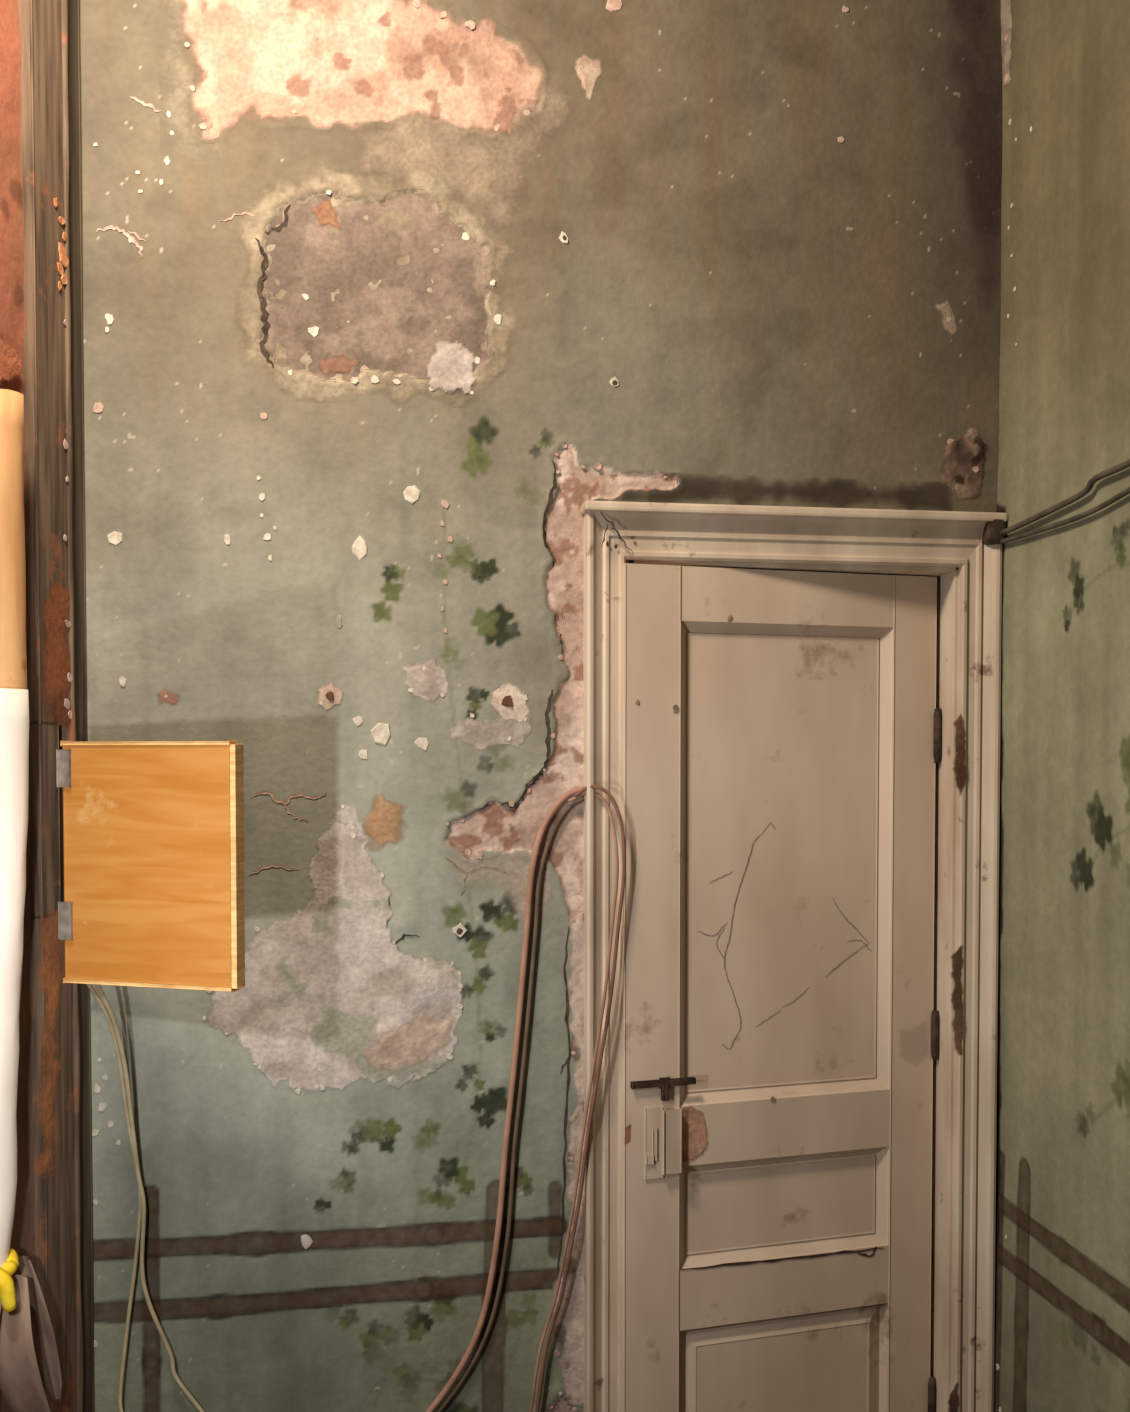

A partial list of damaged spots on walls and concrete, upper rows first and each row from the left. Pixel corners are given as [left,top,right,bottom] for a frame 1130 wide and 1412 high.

peeling [183,0,542,140]
spalling [257,189,502,395]
peeling [438,499,453,558]
spalling [940,427,987,499]
rust [44,584,71,725]
rust [39,912,64,1173]
peeling [202,804,464,1094]
peeling [445,443,679,1412]